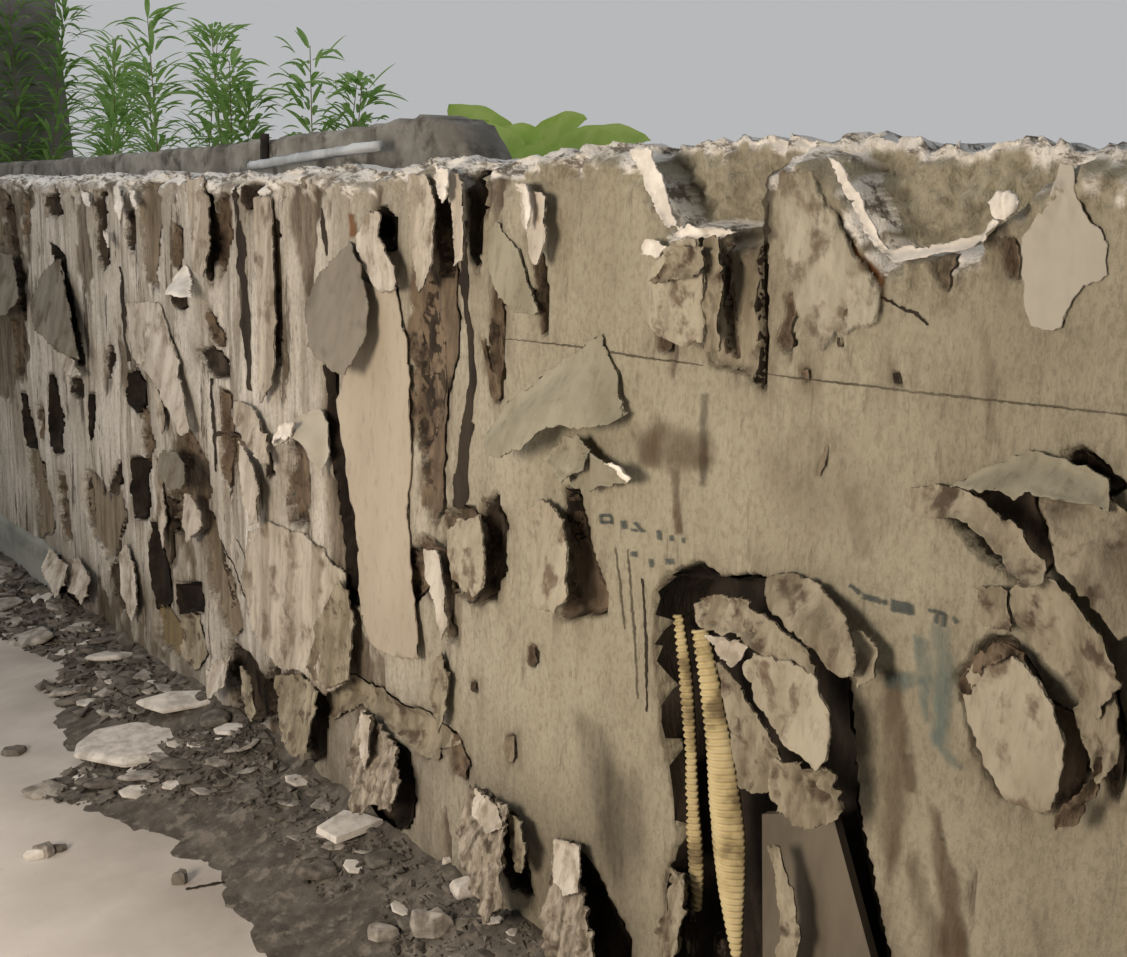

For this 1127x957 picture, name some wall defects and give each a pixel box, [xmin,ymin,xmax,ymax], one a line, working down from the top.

peeling [630,147,879,389]
peeling [828,156,1000,290]
peeling [1002,163,1108,331]
peeling [0,191,96,605]
peeling [81,165,632,927]
spalling [653,564,891,957]
peeling [539,837,632,957]